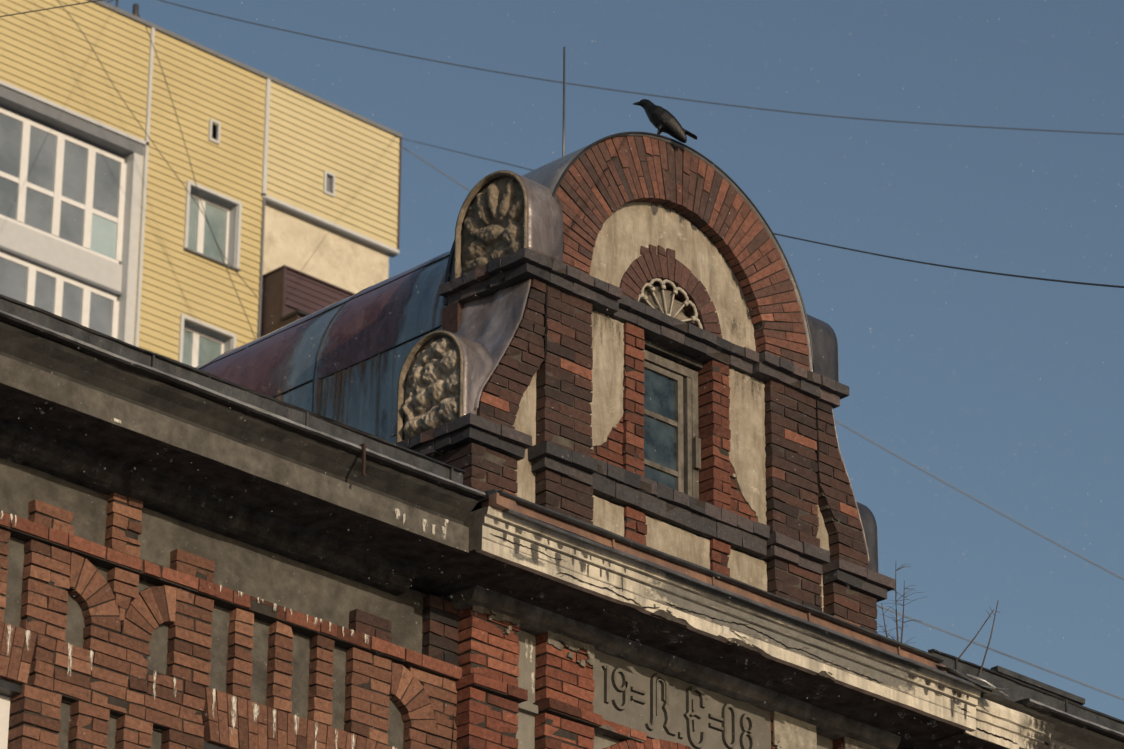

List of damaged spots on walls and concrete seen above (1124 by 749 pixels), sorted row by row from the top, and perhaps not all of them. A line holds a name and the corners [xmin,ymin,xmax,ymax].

corrosion [200,251,448,436]
spalling [590,416,624,468]
spalling [728,462,759,522]
spalling [650,604,687,628]
crack [489,533,883,683]
peeling [547,631,595,668]
spalling [718,633,761,655]
spalling [815,671,836,682]
peeling [773,711,817,749]
peeling [844,736,880,749]